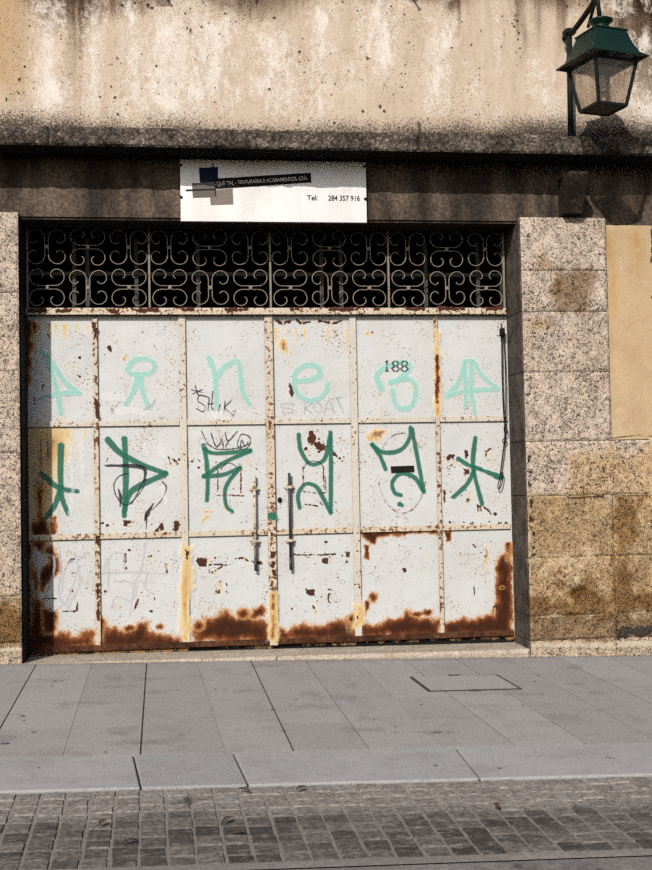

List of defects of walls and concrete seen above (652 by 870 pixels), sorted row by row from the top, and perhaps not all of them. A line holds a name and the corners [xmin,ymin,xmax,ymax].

damp [0,91,652,138]
rust [433,331,441,417]
rust [28,427,515,654]